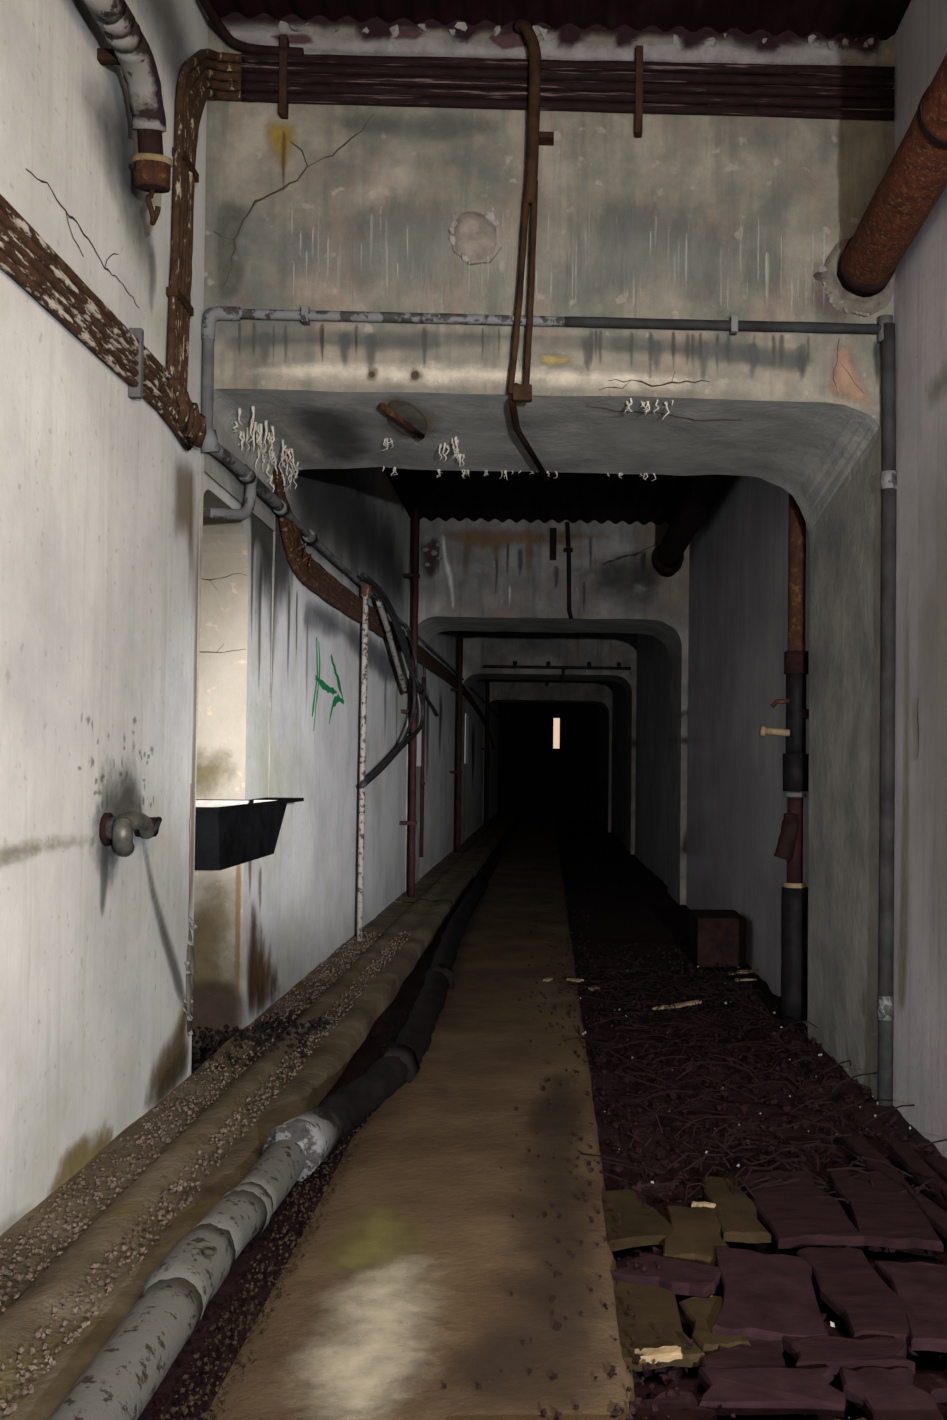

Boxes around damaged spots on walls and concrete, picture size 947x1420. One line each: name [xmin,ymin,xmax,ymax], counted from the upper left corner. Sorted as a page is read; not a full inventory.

crack [26,168,139,308]
crack [214,113,375,288]
water stain [524,258,576,301]
water stain [747,219,782,300]
water stain [280,336,678,419]
water stain [233,406,363,492]
water stain [250,512,398,679]
water stain [438,536,454,605]
water stain [98,778,141,822]
water stain [99,839,115,911]